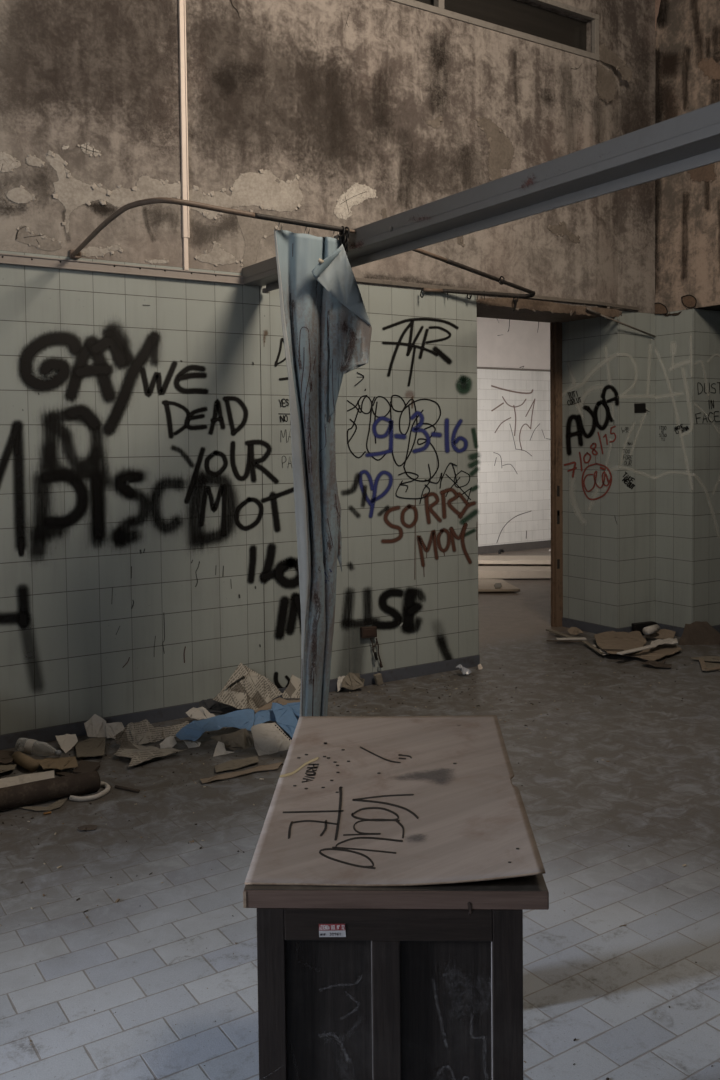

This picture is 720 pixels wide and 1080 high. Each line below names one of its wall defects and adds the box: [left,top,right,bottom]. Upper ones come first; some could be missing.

damp [655,0,720,124]
peeling [0,142,303,267]
peeling [334,183,378,220]
damp [681,194,689,279]